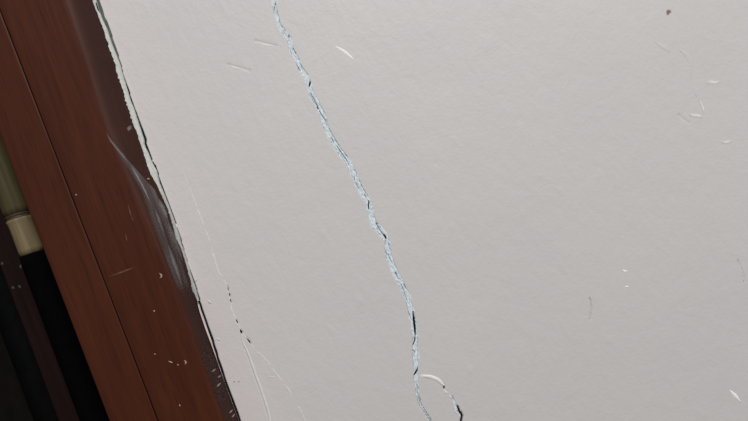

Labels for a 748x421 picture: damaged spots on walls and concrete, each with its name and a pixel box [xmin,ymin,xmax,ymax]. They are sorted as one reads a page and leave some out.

crack [93,0,305,421]
crack [271,0,463,421]